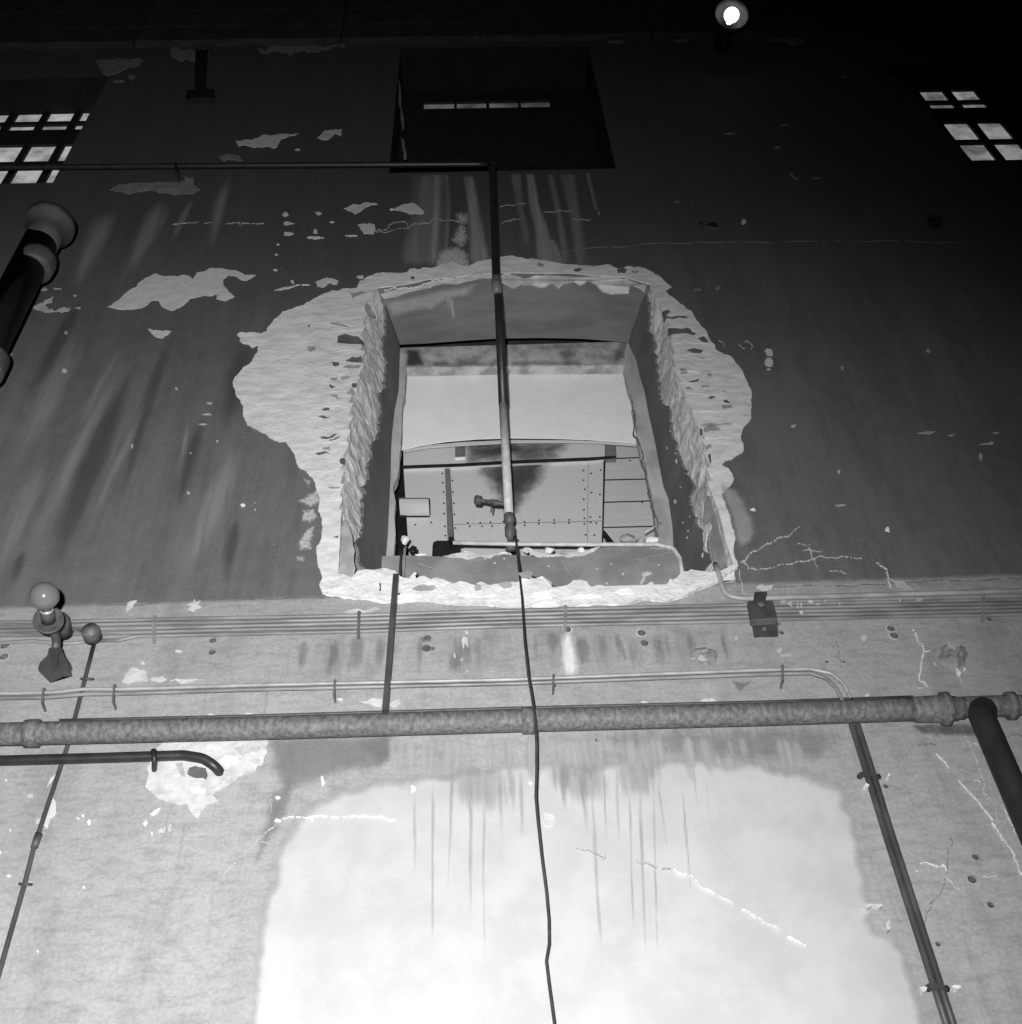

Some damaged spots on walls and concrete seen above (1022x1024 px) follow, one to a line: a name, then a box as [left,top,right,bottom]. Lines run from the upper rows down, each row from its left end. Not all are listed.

peeling [110,176,200,195]
peeling [219,133,298,161]
peeling [317,129,342,140]
peeling [108,268,256,311]
spalling [233,255,756,613]
crack [739,526,1022,595]
crack [781,629,937,689]
spalling [142,740,269,826]
crack [223,793,396,876]
crack [917,726,1022,878]
crack [636,861,806,947]
crack [916,838,960,924]